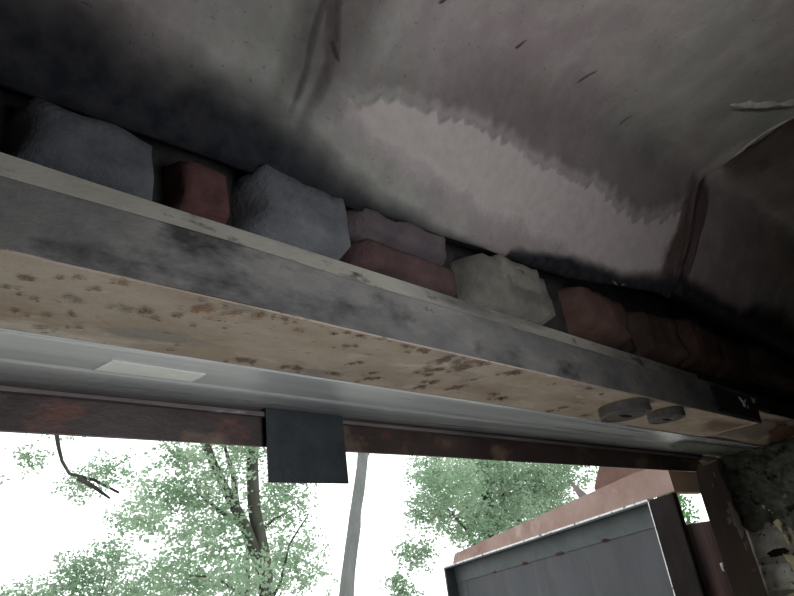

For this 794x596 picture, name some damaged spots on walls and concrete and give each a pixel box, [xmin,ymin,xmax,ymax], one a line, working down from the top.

damp [349,98,687,277]